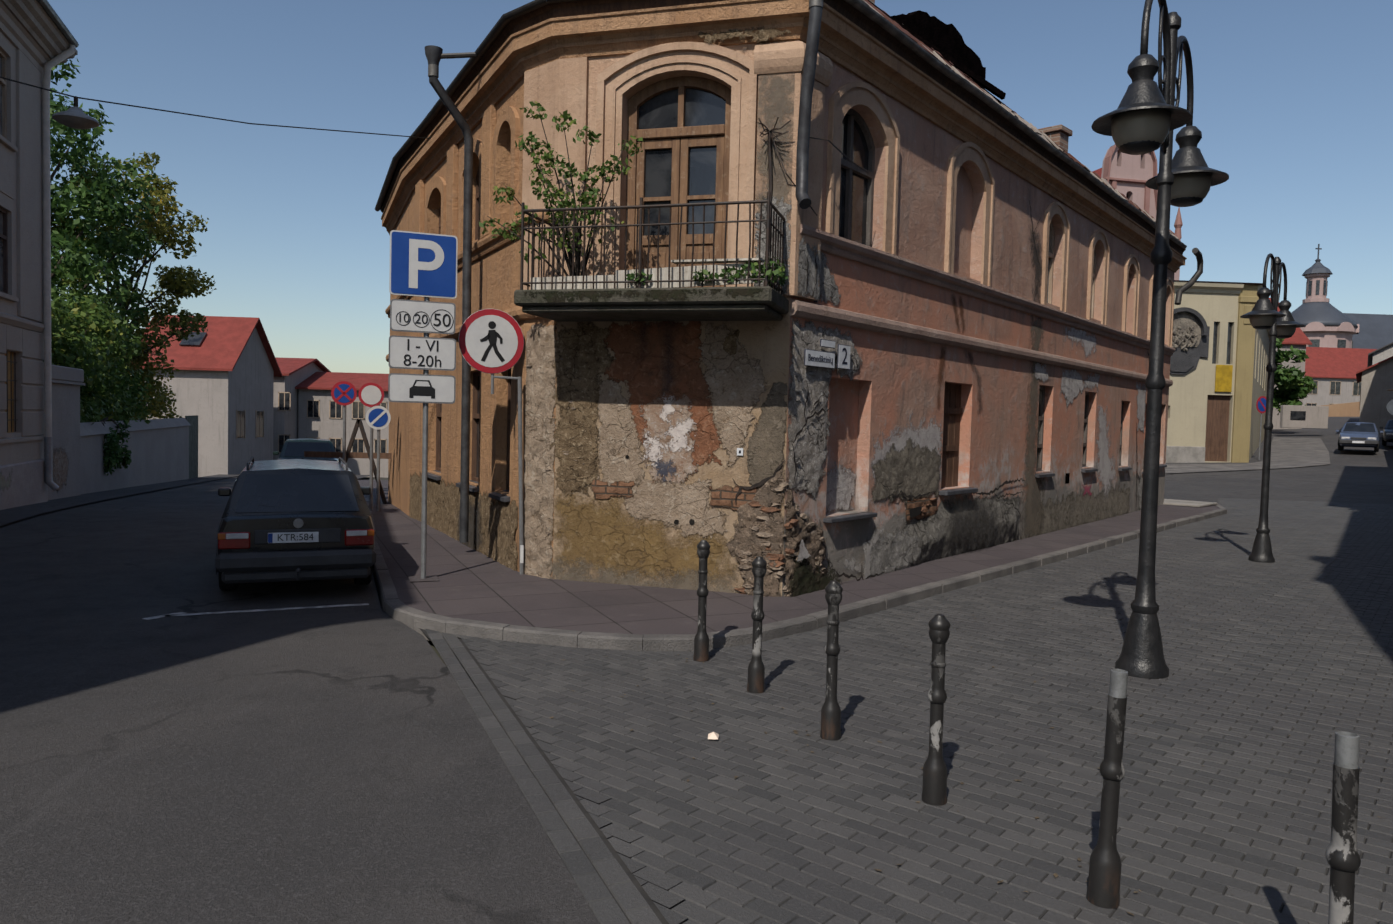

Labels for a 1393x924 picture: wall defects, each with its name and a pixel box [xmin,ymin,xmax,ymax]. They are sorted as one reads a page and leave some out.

peeling [754,196,841,307]
peeling [409,318,942,597]
crack [733,384,830,503]